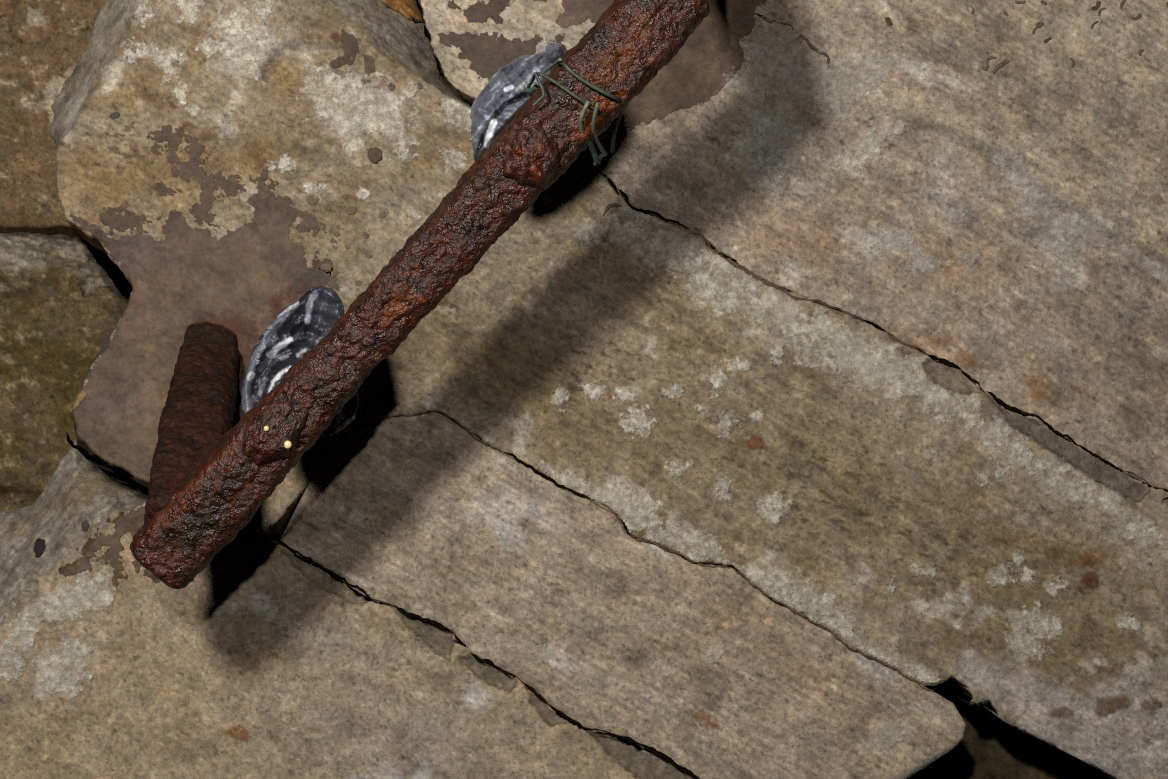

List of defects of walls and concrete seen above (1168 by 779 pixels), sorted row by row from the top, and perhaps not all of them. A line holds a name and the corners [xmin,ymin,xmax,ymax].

water stain [300,29,425,165]
water stain [440,94,472,173]
water stain [437,0,613,82]
water stain [622,0,913,193]
crack [603,189,1168,501]
crack [446,415,934,691]
crack [272,540,700,779]